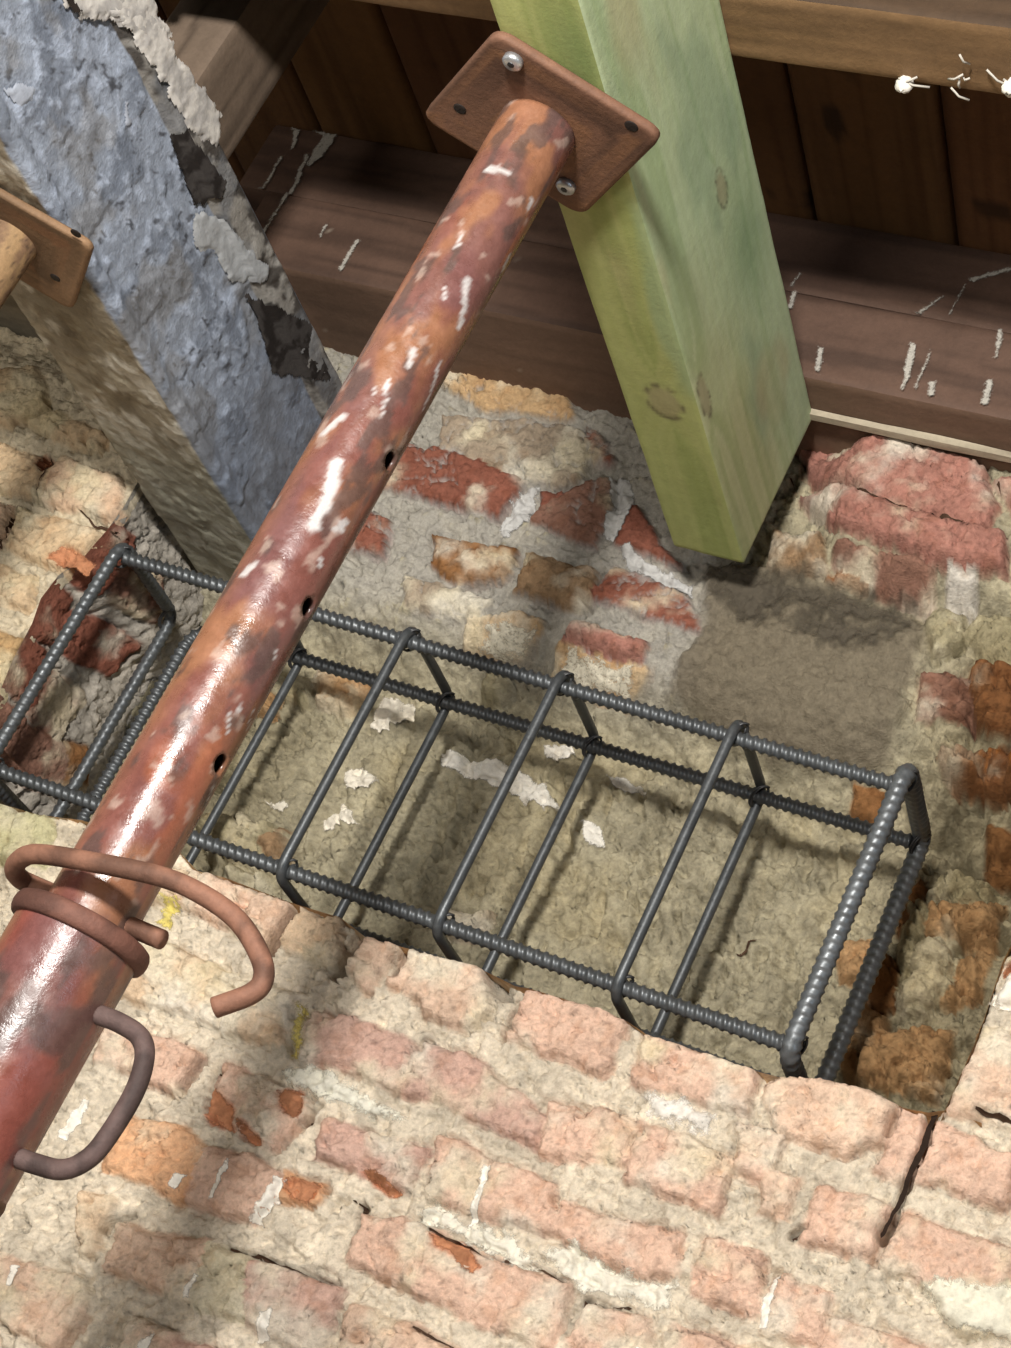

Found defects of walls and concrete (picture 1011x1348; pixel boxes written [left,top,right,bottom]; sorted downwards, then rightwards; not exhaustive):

peeling [3,83,36,106]
peeling [63,0,331,382]
spalling [36,458,52,471]
spalling [49,546,95,577]
crack [976,1106,1011,1124]
crack [880,1111,938,1238]